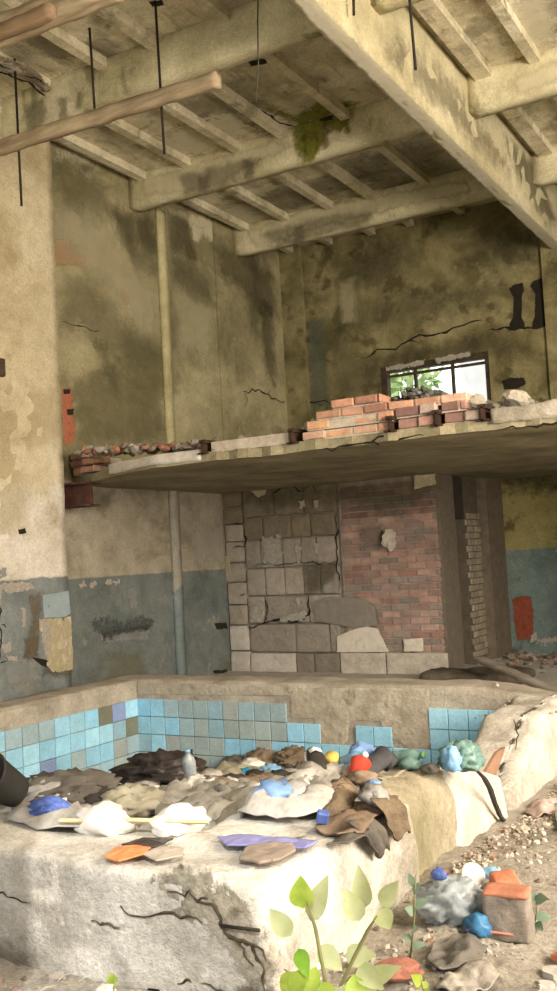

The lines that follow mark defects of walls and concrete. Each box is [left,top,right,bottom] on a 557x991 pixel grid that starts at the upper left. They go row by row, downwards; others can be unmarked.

damp [304,122,328,164]
crack [357,320,543,358]
peeling [414,474,436,490]
peeling [79,579,120,589]
spalling [0,580,73,672]
peeling [337,627,389,652]
peeling [403,638,423,652]
spalling [512,596,557,646]
crack [91,890,267,991]